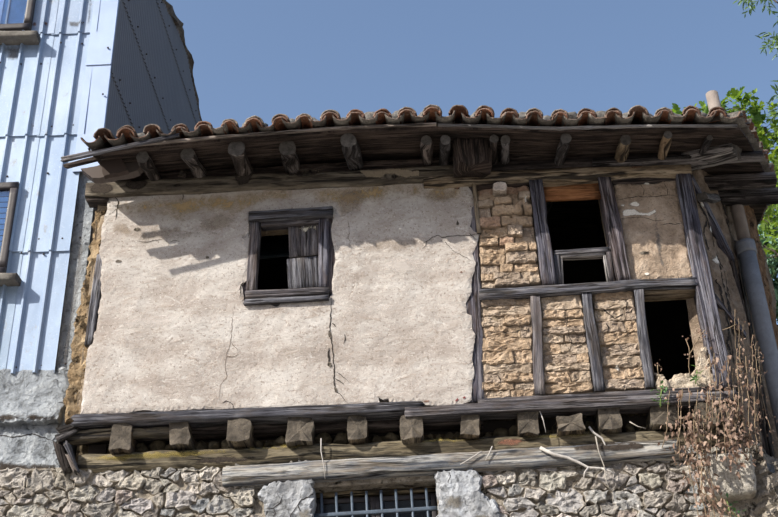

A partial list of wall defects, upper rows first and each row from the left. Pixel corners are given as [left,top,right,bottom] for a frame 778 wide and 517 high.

crack [423,234,474,261]
crack [219,330,238,405]
crack [328,298,347,399]